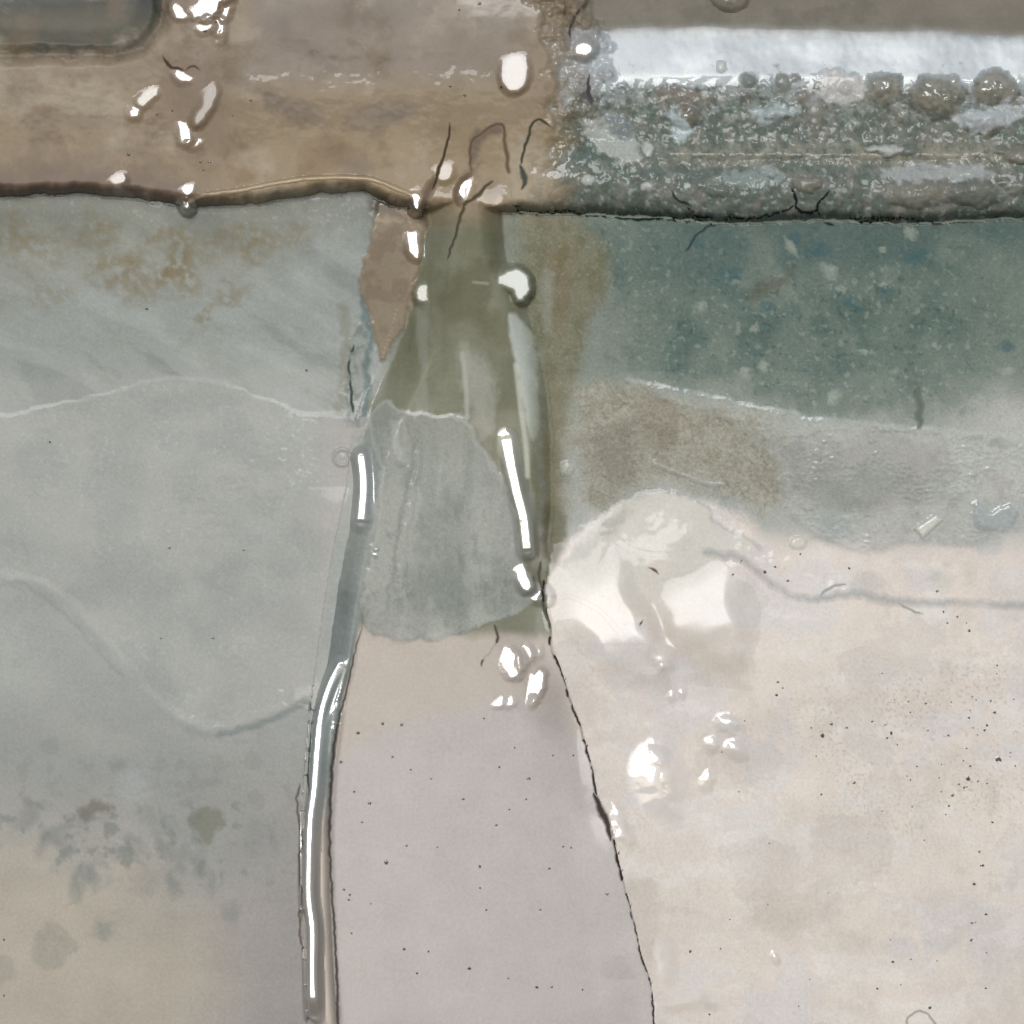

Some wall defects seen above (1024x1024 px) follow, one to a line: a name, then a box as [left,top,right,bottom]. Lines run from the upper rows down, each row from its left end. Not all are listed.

crack [415,118,1022,262]
crack [347,344,355,413]
water stain [0,709,310,987]
water stain [321,829,336,870]
water stain [325,746,343,806]
crack [536,561,656,1024]